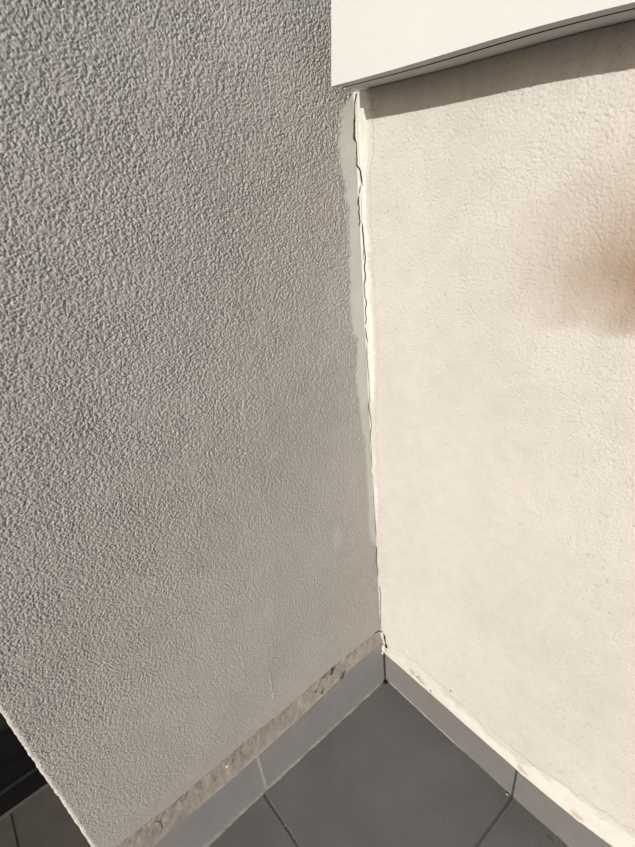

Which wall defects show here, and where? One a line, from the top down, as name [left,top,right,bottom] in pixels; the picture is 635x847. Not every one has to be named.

crack [353,94,381,628]